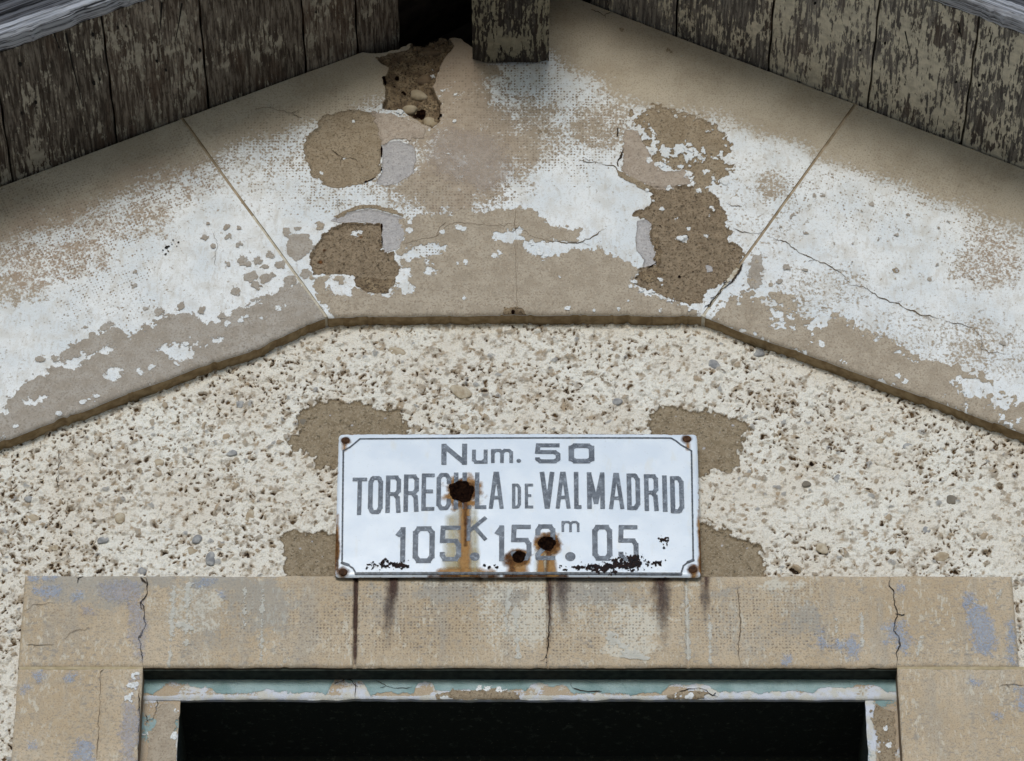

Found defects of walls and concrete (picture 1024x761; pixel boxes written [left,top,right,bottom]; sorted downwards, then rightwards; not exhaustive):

spalling [303,38,454,188]
peeling [0,103,1024,441]
crack [730,205,1002,354]
spalling [287,397,410,470]
spalling [647,405,752,478]
spalling [280,529,336,576]
rust [429,477,568,577]
spalling [700,521,768,577]
crack [138,578,148,669]
crack [889,580,904,660]
peeling [435,685,520,700]
peeling [667,691,708,700]